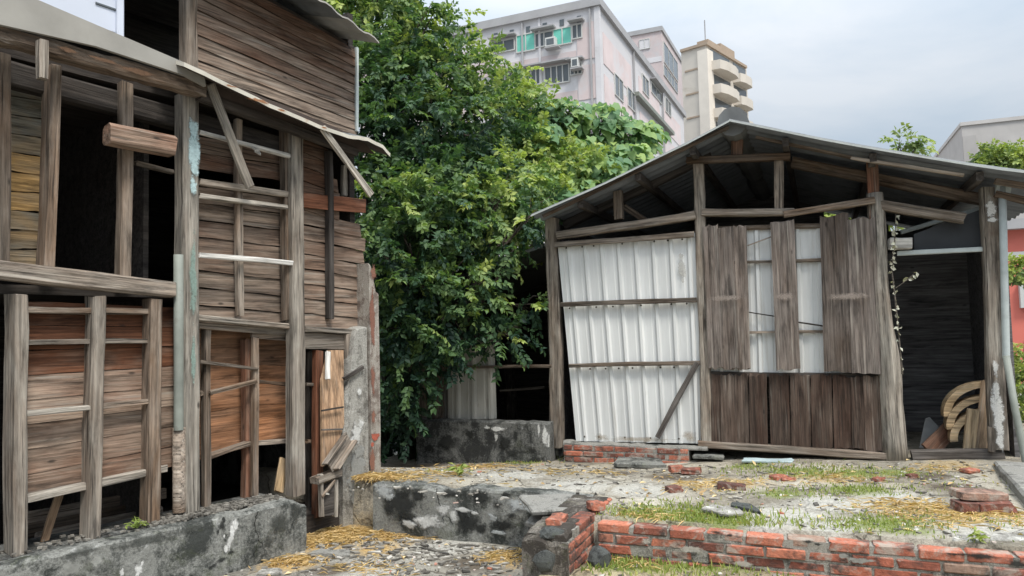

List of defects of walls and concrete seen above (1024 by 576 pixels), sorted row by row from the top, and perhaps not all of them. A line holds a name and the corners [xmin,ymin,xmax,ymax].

peeling [189,120,200,193]
peeling [990,361,1005,449]
flaking render [350,411,380,471]
damp [424,425,517,456]
damp [537,425,550,447]
damp [59,546,102,575]
damp [131,535,169,546]
damp [209,517,239,568]
damp [266,506,298,546]
damp [383,489,424,521]
damp [441,488,515,533]